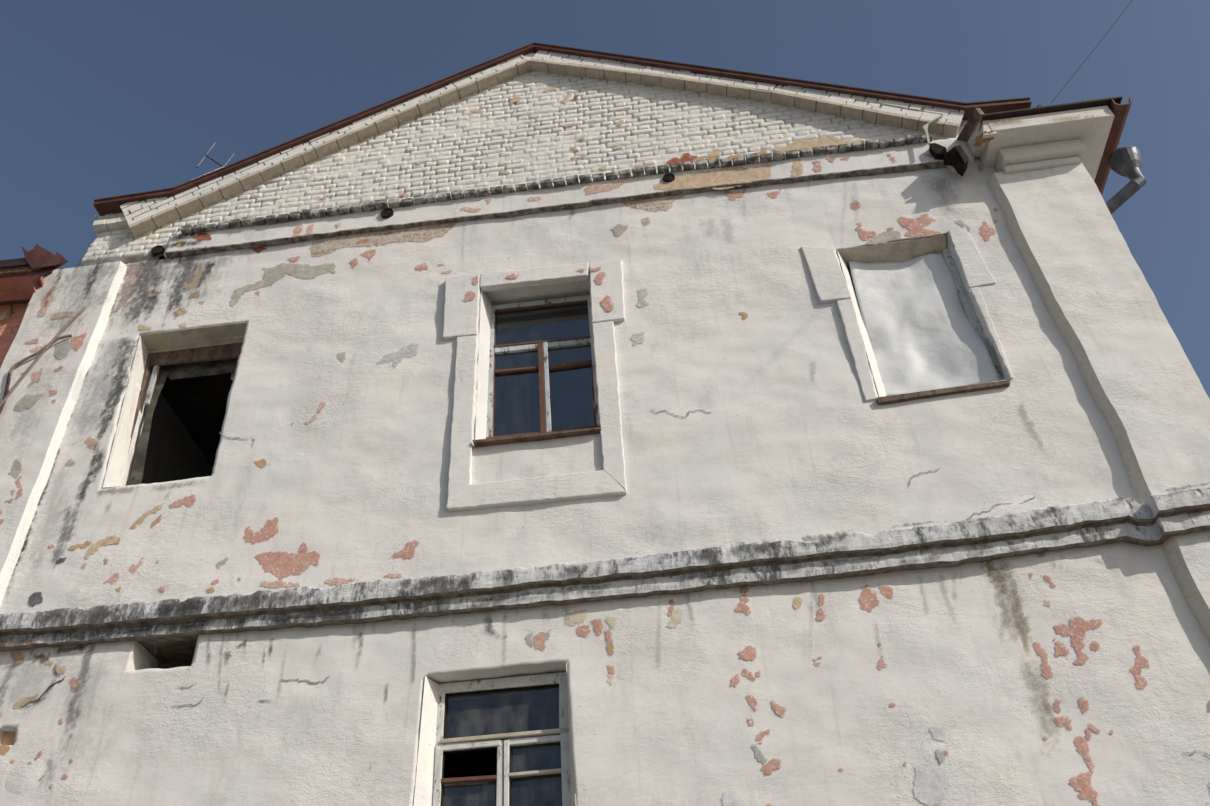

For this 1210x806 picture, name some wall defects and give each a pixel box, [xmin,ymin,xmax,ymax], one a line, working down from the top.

peeling [850,200,941,245]
flaking render [230,198,491,306]
crack [653,409,713,418]
water stain [8,449,60,588]
peeling [243,517,320,588]
water stain [683,541,775,578]
water stain [28,591,43,607]
water stain [107,598,221,633]
water stain [413,577,440,589]
crack [21,667,66,707]
peeling [730,646,786,775]
peeling [1054,698,1113,806]